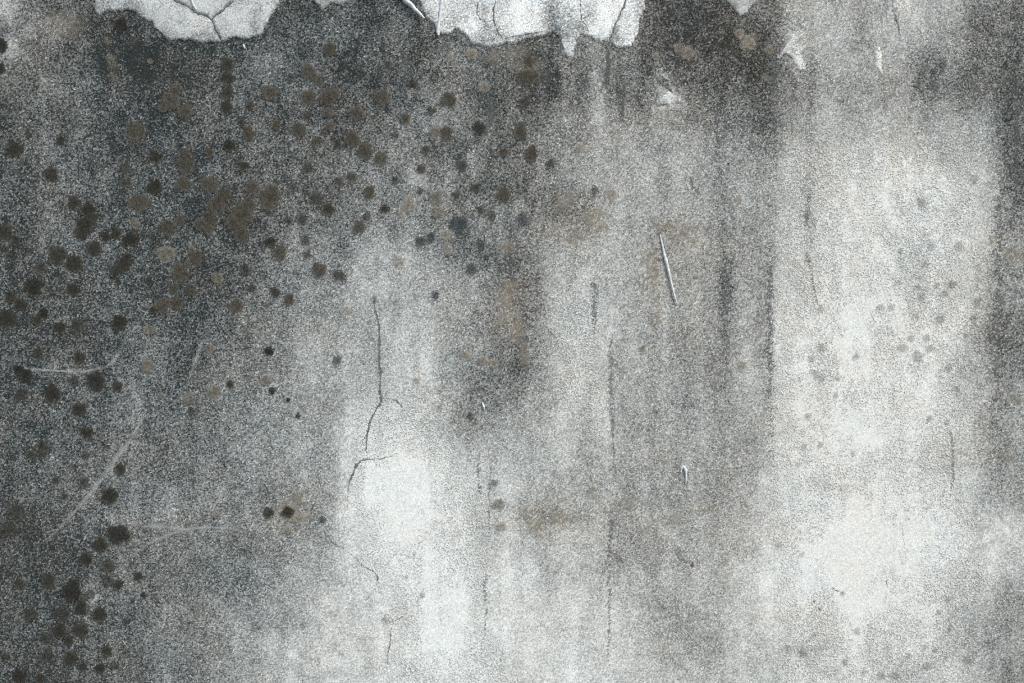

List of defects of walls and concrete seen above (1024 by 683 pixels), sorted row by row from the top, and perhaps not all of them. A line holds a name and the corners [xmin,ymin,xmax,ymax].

water stain [0,36,8,75]
peeling [93,0,280,49]
peeling [419,0,645,59]
water stain [148,56,390,283]
water stain [448,48,559,293]
water stain [0,195,140,334]
water stain [0,524,146,683]
water stain [43,350,123,460]
water stain [77,462,126,505]
crack [347,298,403,497]
water stain [347,387,511,683]
water stain [555,283,614,461]